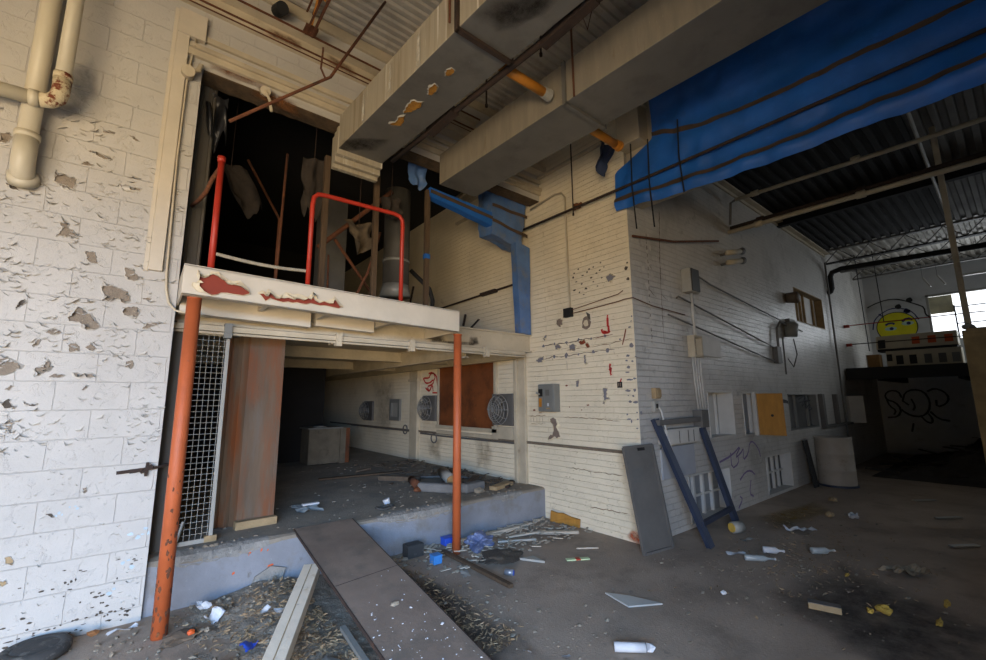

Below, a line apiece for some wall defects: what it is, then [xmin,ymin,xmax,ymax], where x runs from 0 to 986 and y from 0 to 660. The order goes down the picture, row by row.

peeling [0,114,179,458]
peeling [191,270,343,309]
peeling [96,385,165,471]
peeling [1,544,46,577]
peeling [0,552,143,649]